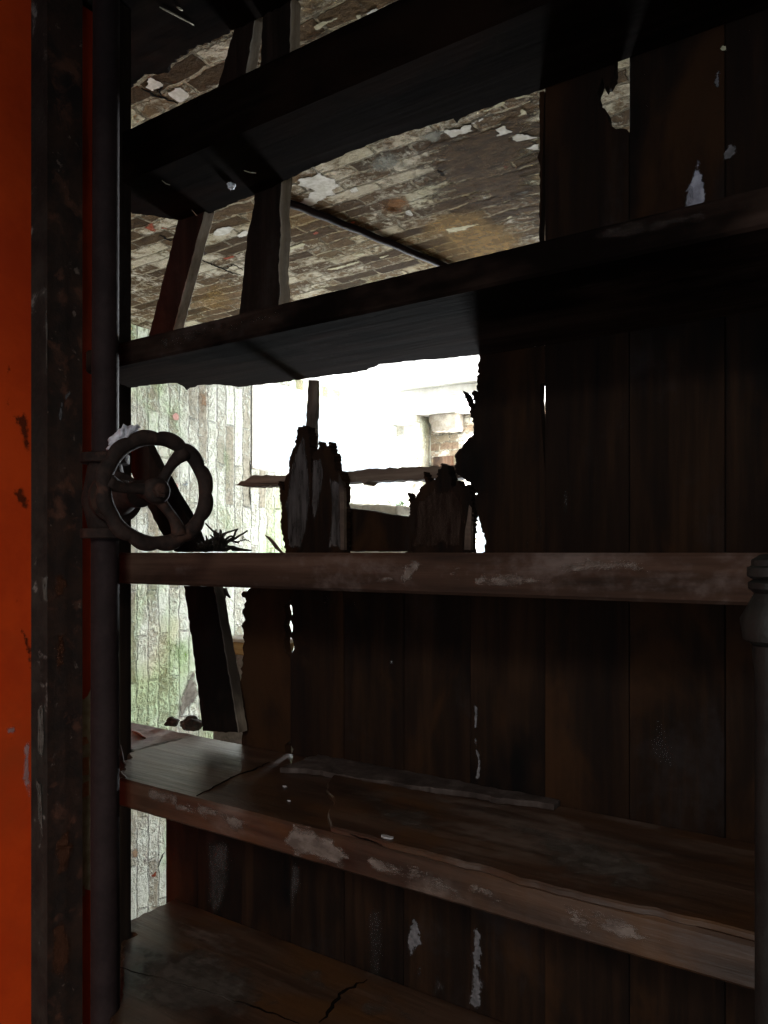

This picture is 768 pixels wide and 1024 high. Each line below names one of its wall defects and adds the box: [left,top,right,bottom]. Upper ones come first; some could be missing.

peeling [146,78,189,102]
peeling [298,173,358,206]
flaking render [410,95,540,235]
peeling [685,162,706,207]
crack [196,762,269,796]
crack [236,979,367,1024]